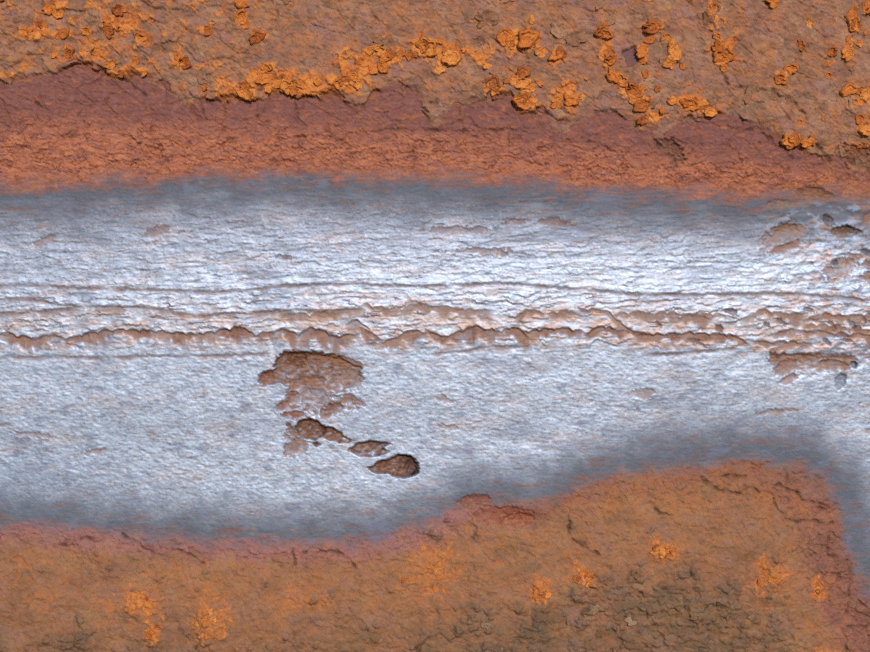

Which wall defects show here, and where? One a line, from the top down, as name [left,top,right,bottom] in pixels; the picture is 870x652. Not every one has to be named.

rust [0,0,870,182]
spalling [815,142,870,191]
spalling [758,218,816,259]
spalling [823,212,870,240]
spalling [817,249,870,291]
spalling [713,308,745,337]
spalling [761,313,790,332]
spalling [766,308,870,393]
spalling [258,349,420,479]
rust [0,459,870,652]